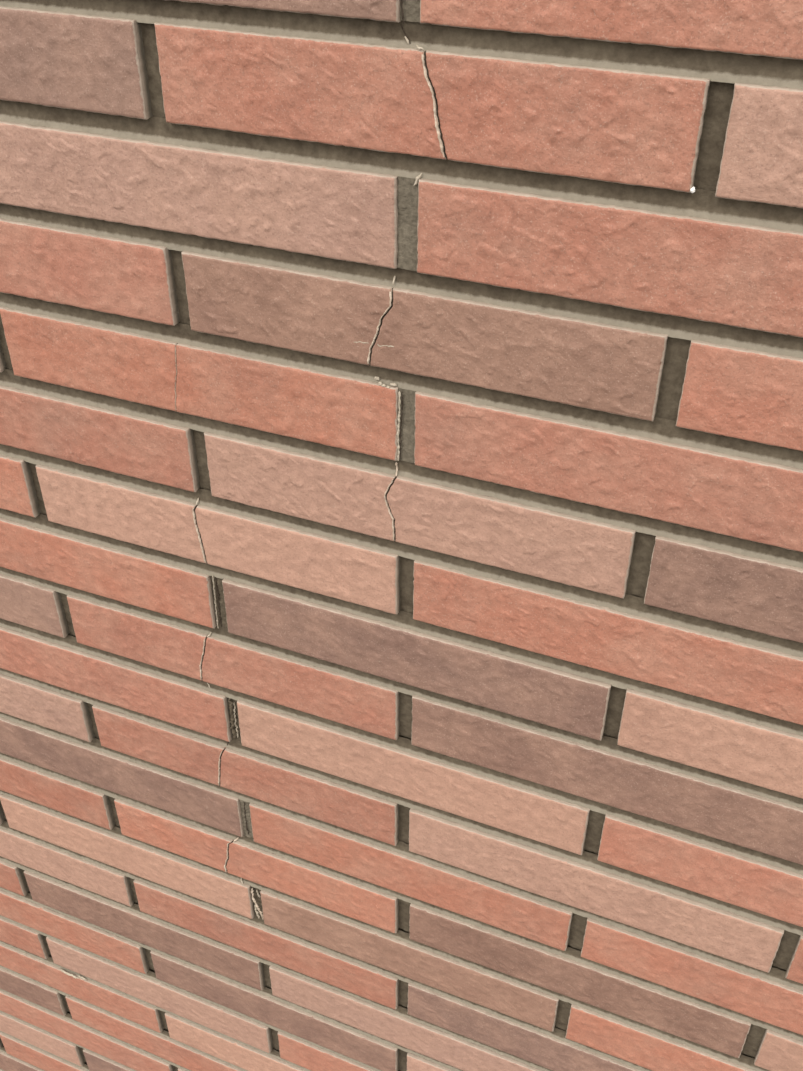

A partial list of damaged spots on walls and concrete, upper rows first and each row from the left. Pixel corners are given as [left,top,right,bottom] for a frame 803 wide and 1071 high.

crack [400,0,447,159]
crack [367,173,422,364]
crack [384,388,416,541]
crack [192,498,253,885]